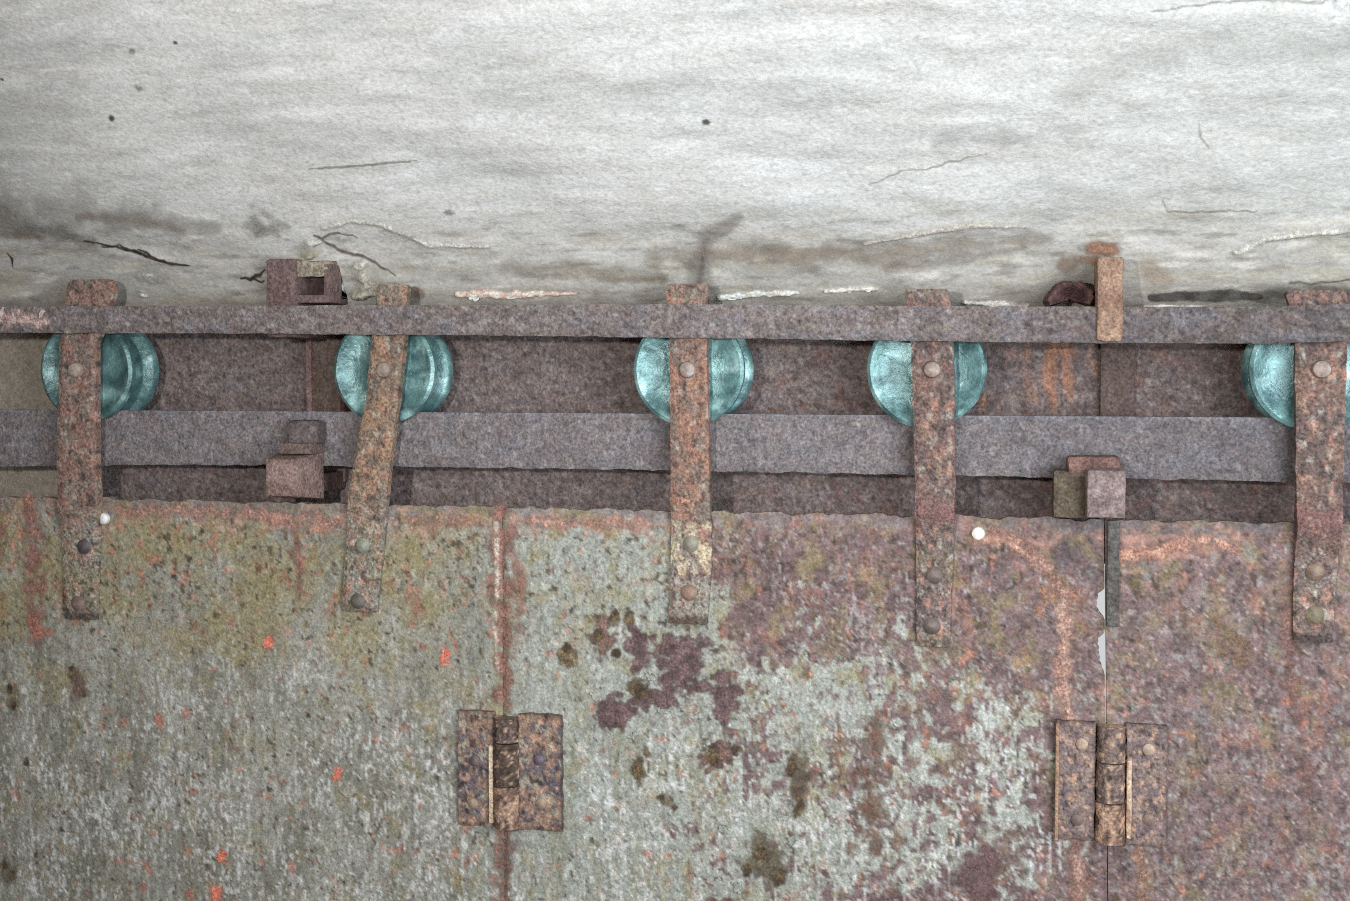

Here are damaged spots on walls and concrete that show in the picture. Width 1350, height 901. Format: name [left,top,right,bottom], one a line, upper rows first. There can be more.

crack [84,241,189,266]
crack [313,232,396,276]
crack [1289,278,1350,286]
rust [20,491,52,646]
rust [114,503,344,593]
rust [1119,535,1238,562]
rust [489,505,671,709]
rust [973,525,1075,720]
rust [440,648,450,666]
rust [854,711,890,855]
rust [1069,839,1093,901]